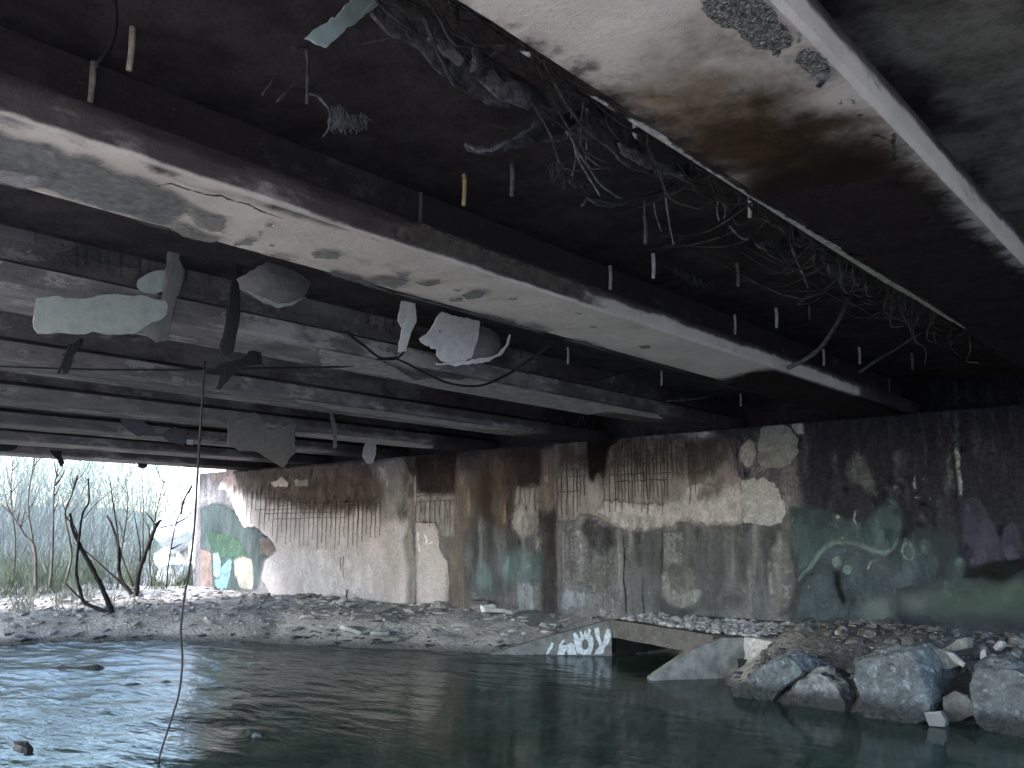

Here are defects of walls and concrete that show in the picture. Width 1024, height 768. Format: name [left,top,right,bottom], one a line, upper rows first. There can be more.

spalling [701,0,830,88]
crack [158,183,281,218]
peeling [33,251,184,374]
peeling [237,244,311,308]
peeling [312,250,663,420]
spalling [553,423,804,532]
water stain [539,509,560,614]